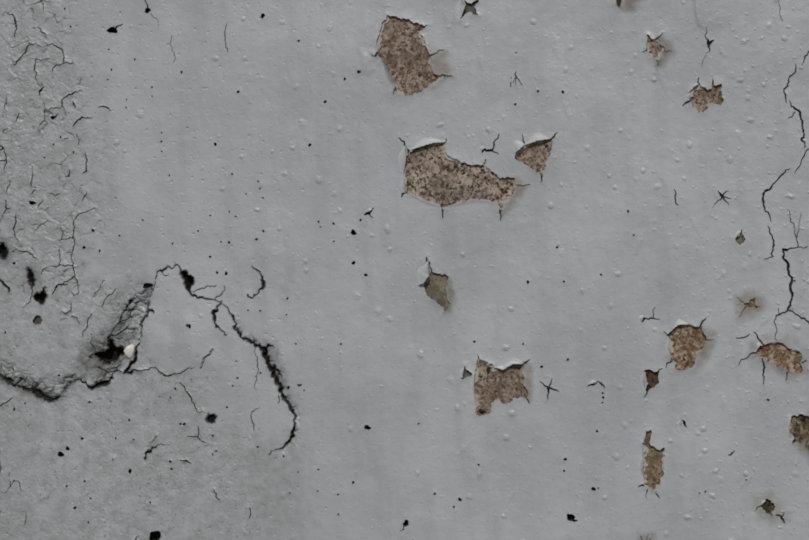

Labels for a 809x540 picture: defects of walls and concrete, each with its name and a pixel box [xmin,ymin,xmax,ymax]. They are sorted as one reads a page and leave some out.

peeling [372,15,452,96]
crack [0,0,213,443]
peeling [398,137,531,221]
peeling [513,132,558,182]
crack [762,51,809,341]
crack [247,266,266,299]
spalling [89,338,125,365]
crack [195,285,297,455]
peeling [460,356,530,416]
peeling [640,318,713,397]
crack [144,436,191,464]
peeling [638,430,665,498]